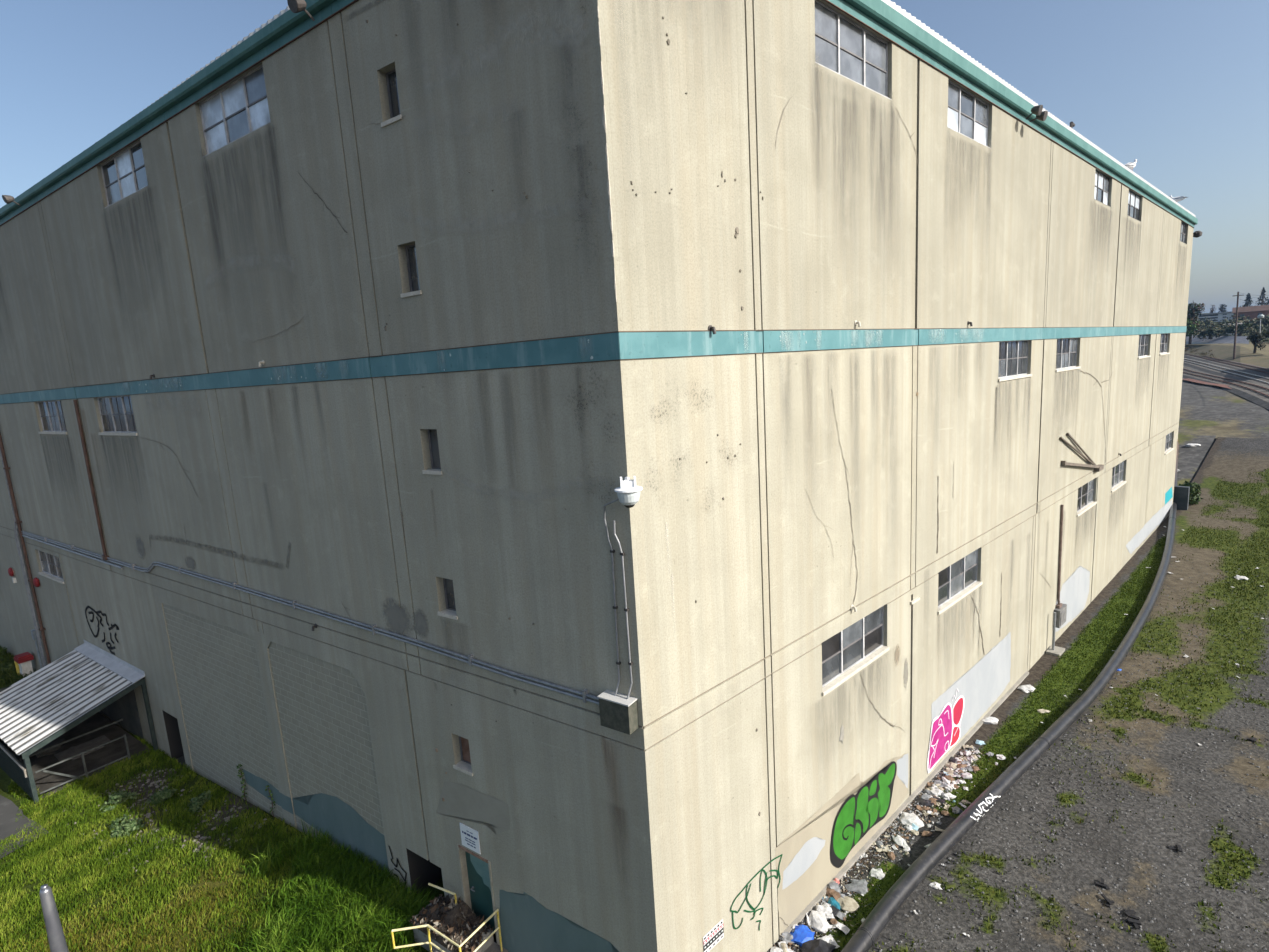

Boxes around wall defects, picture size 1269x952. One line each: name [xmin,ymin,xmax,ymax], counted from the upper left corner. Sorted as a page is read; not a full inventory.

crack [807,389,858,605]
crack [861,676,905,732]